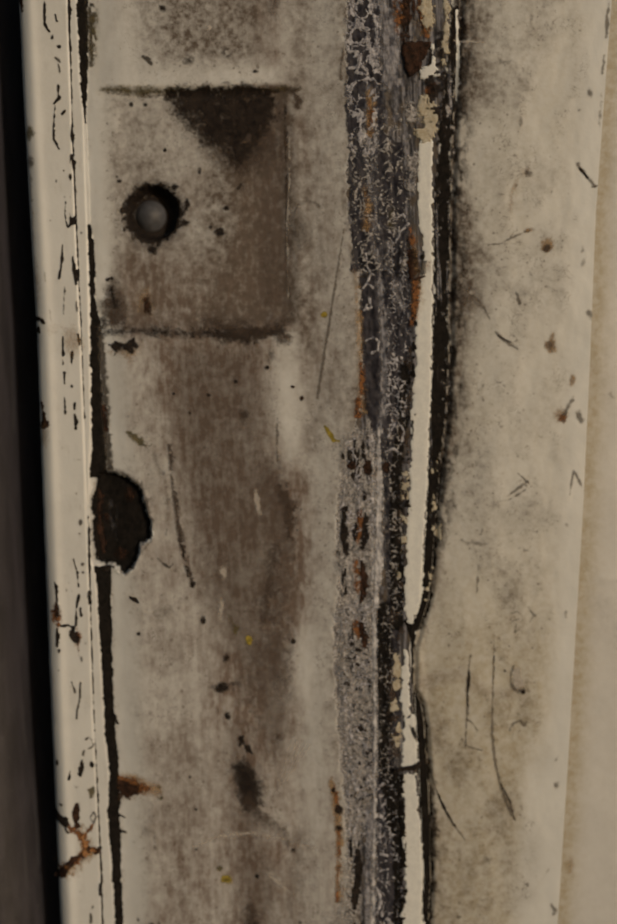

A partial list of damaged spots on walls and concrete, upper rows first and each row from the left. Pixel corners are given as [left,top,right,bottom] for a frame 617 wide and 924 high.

peeling [43,2,61,72]
corrosion [393,0,431,77]
peeling [53,84,66,149]
damp [102,85,302,172]
peeling [58,244,80,285]
peeling [79,472,154,576]
corrosion [340,506,370,604]
peeling [56,559,91,653]
peeling [68,737,94,781]
corrosion [118,776,163,800]
corrosion [55,803,102,878]
corrosion [329,780,364,924]